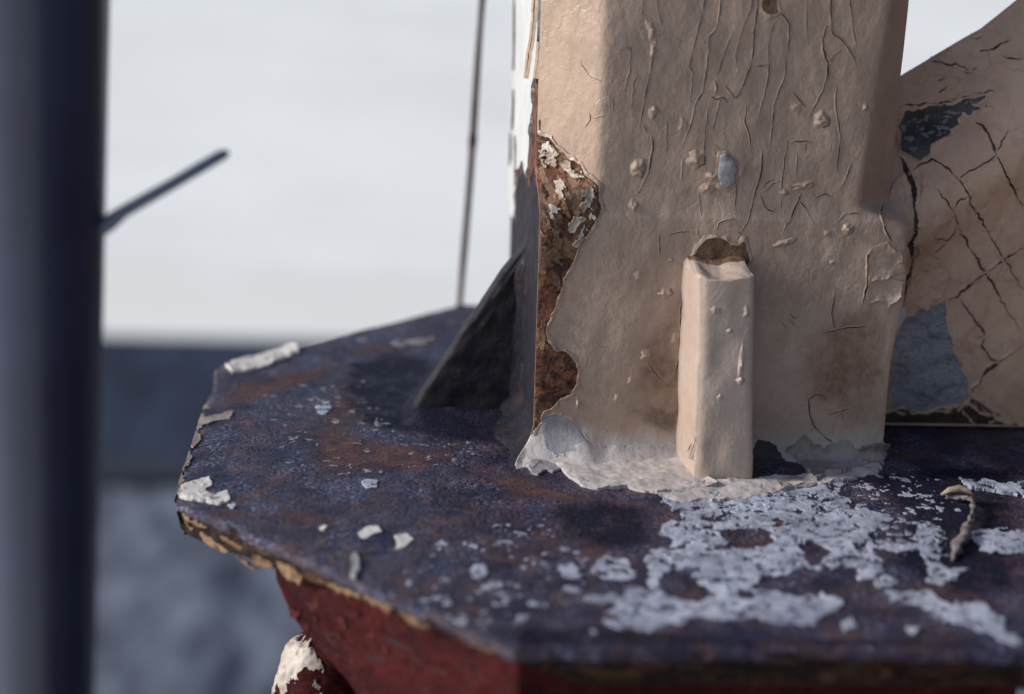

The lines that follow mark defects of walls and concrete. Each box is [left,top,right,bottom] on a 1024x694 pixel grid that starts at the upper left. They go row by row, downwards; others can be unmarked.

crack [579,0,1024,417]
peeling [214,343,299,377]
peeling [404,82,1024,647]
peeling [178,404,237,509]
peeling [271,599,360,694]